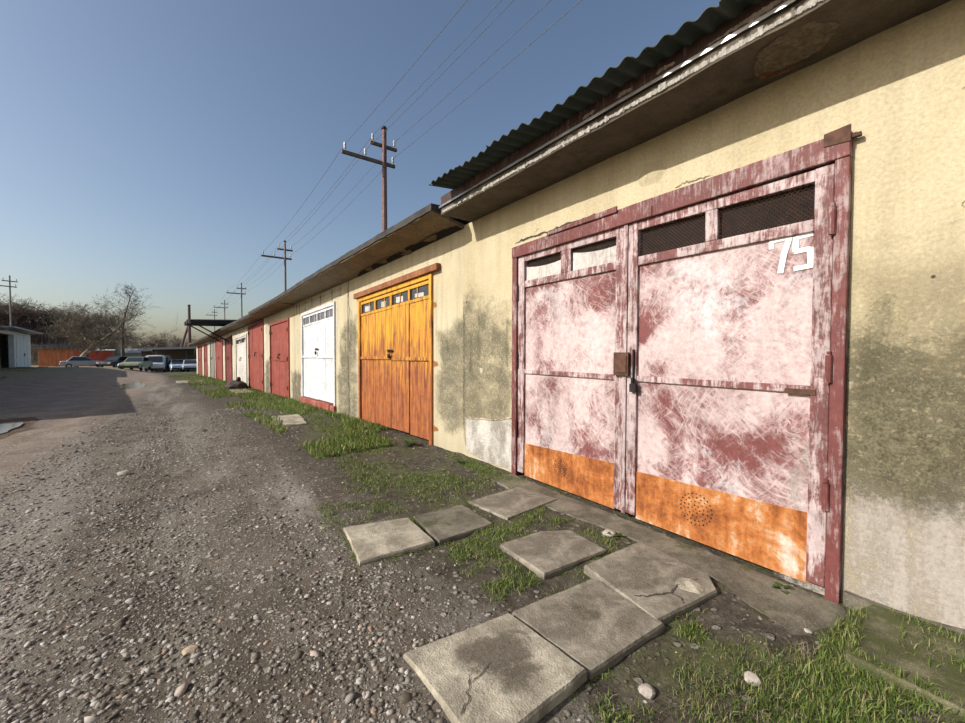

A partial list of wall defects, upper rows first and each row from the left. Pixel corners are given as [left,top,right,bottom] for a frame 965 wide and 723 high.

damp [338,321,357,418]
damp [438,300,512,430]
damp [842,330,965,629]
damp [785,575,825,595]
crack [460,662,491,714]